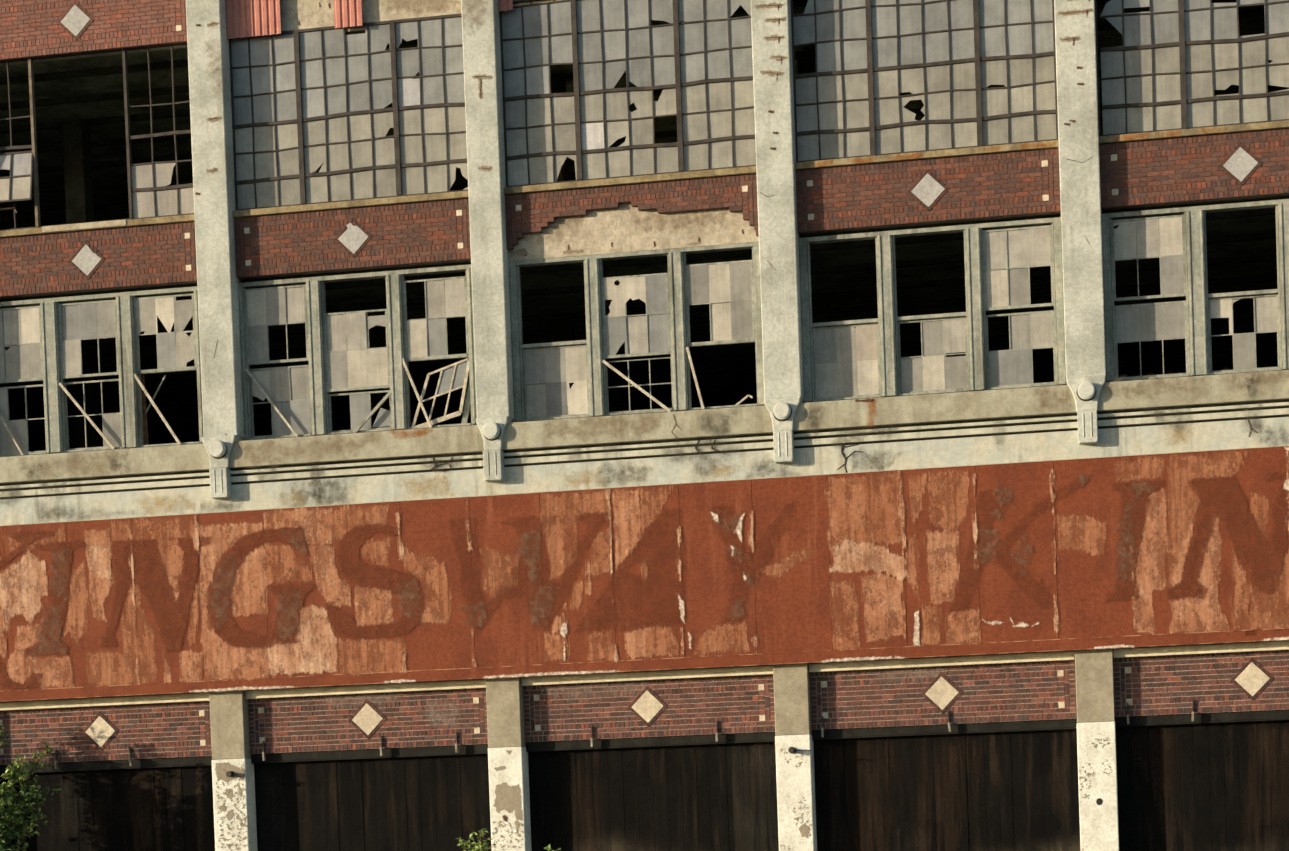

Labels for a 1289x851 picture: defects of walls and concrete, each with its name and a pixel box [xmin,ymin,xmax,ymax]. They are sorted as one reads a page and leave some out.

spalling [508,202,759,262]
crack [837,443,861,473]
peeling [214,762,248,851]
peeling [492,750,524,851]
peeling [780,797,811,850]